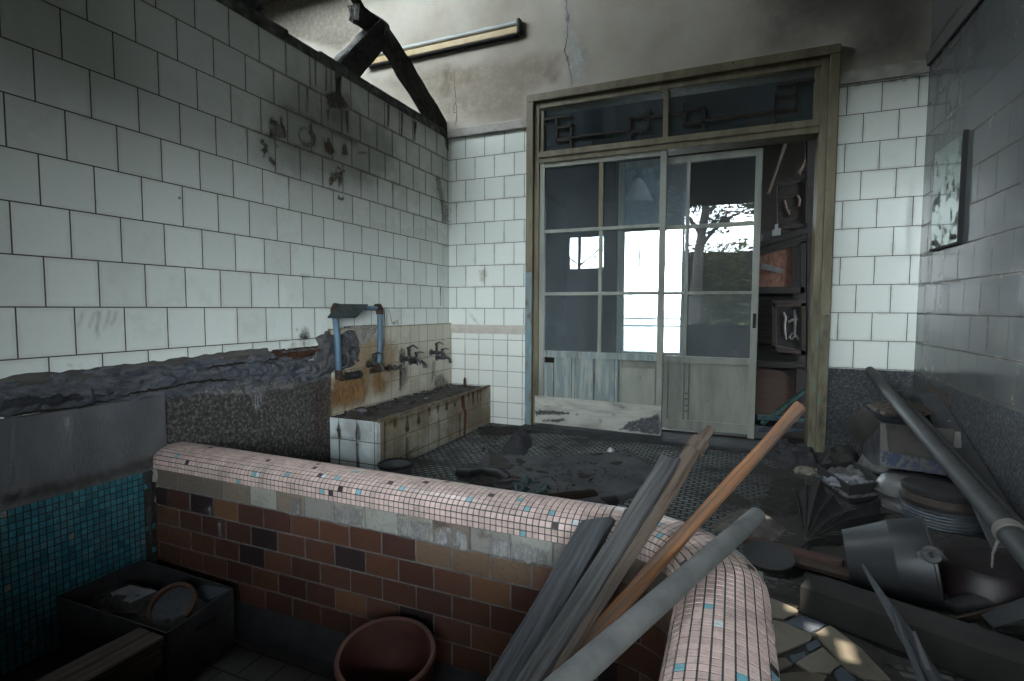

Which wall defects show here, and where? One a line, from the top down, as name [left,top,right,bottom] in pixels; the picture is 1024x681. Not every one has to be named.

crack [564,1,575,85]
flaking render [0,346,331,418]
corrosion [331,341,394,408]